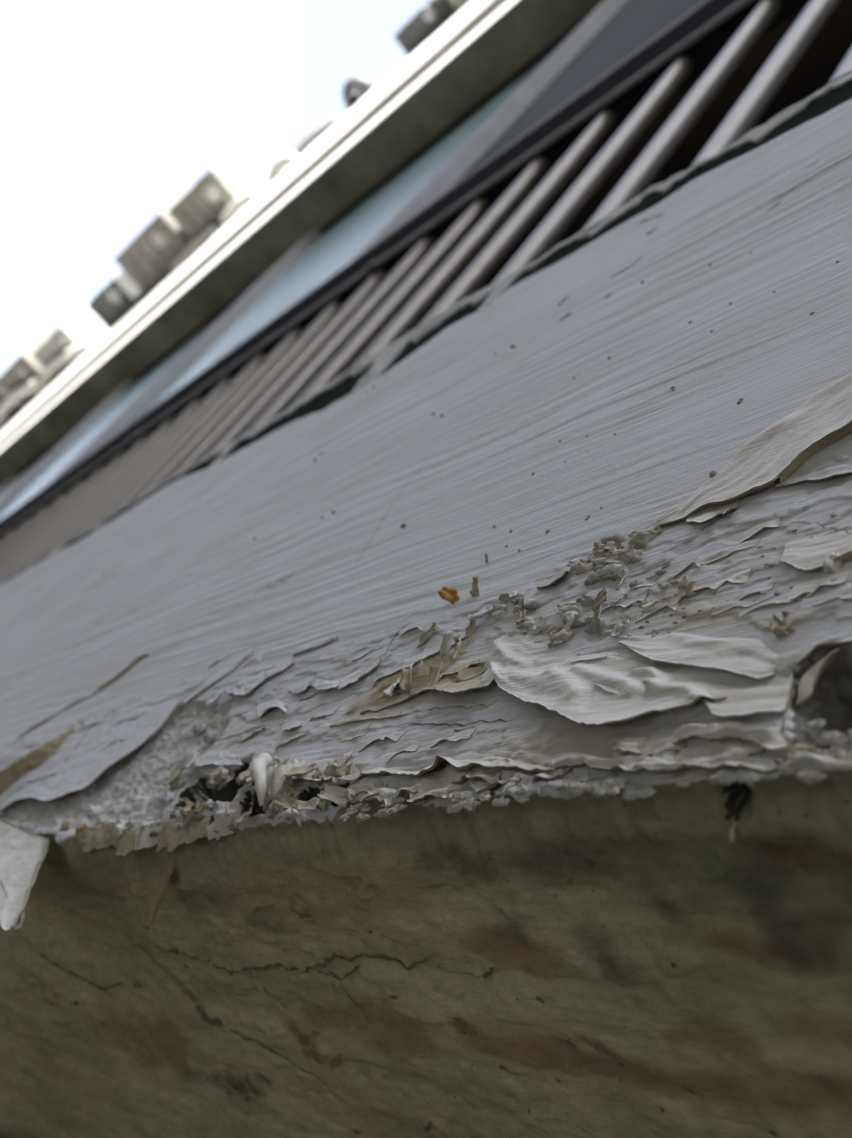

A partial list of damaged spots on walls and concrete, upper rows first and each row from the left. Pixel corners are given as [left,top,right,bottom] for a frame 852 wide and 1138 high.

peeling [0,373,852,932]
crack [134,945,330,1089]